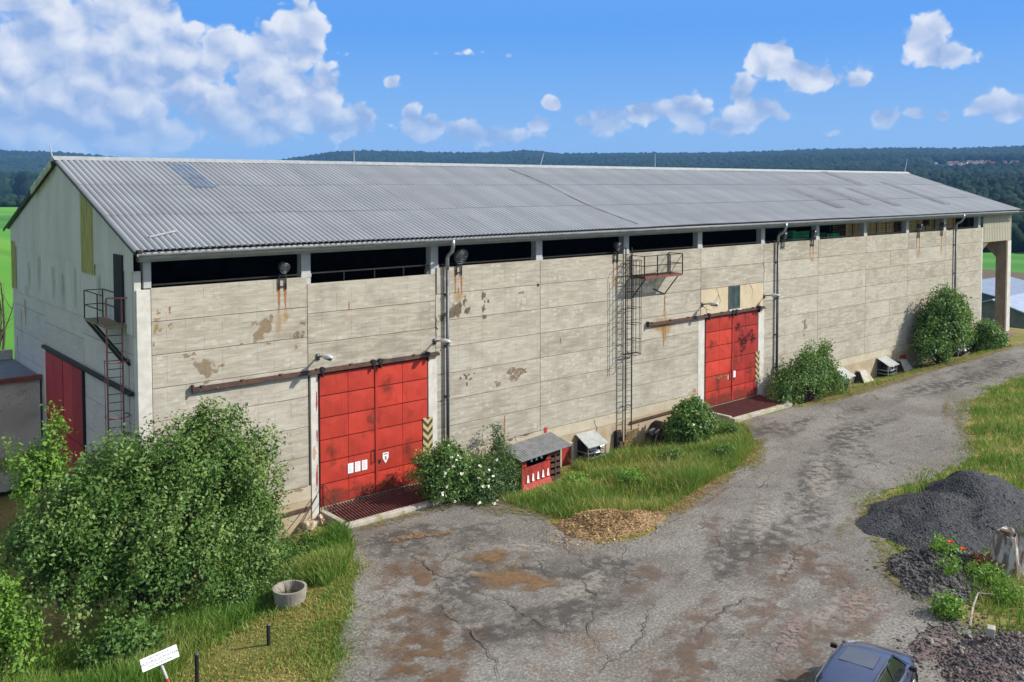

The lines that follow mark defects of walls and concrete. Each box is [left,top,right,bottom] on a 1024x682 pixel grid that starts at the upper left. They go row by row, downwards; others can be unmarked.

peeling [240,314,274,345]
peeling [183,352,225,384]
spalling [495,367,527,387]